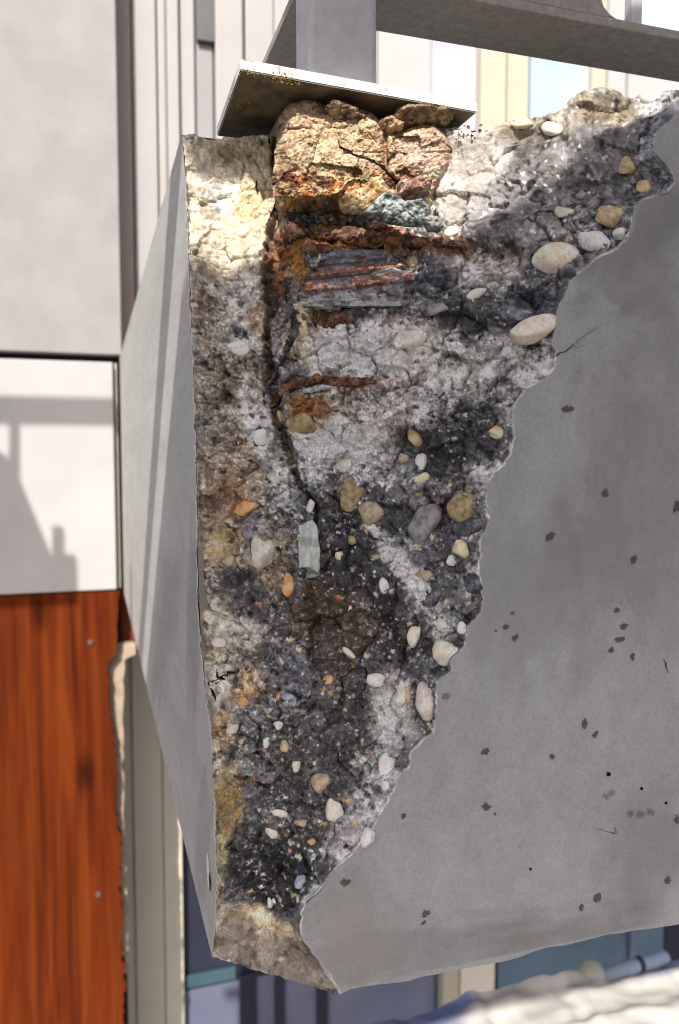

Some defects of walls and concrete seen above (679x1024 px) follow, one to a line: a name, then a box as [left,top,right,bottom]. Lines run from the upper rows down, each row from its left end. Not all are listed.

crack [338,139,414,183]
corrosion [268,211,465,295]
corrosion [312,308,356,329]
corrosion [269,373,377,419]
spalling [182,87,679,995]